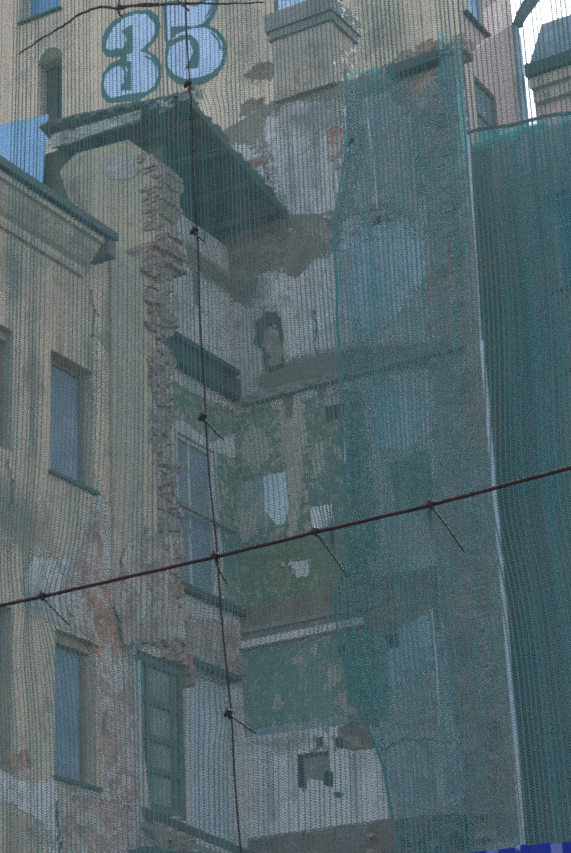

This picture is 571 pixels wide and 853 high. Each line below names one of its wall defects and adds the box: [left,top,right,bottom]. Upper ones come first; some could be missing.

flaking render [231,92,429,358]
flaking render [23,495,112,633]
peeling [59,242,435,852]
flaking render [384,707,460,819]